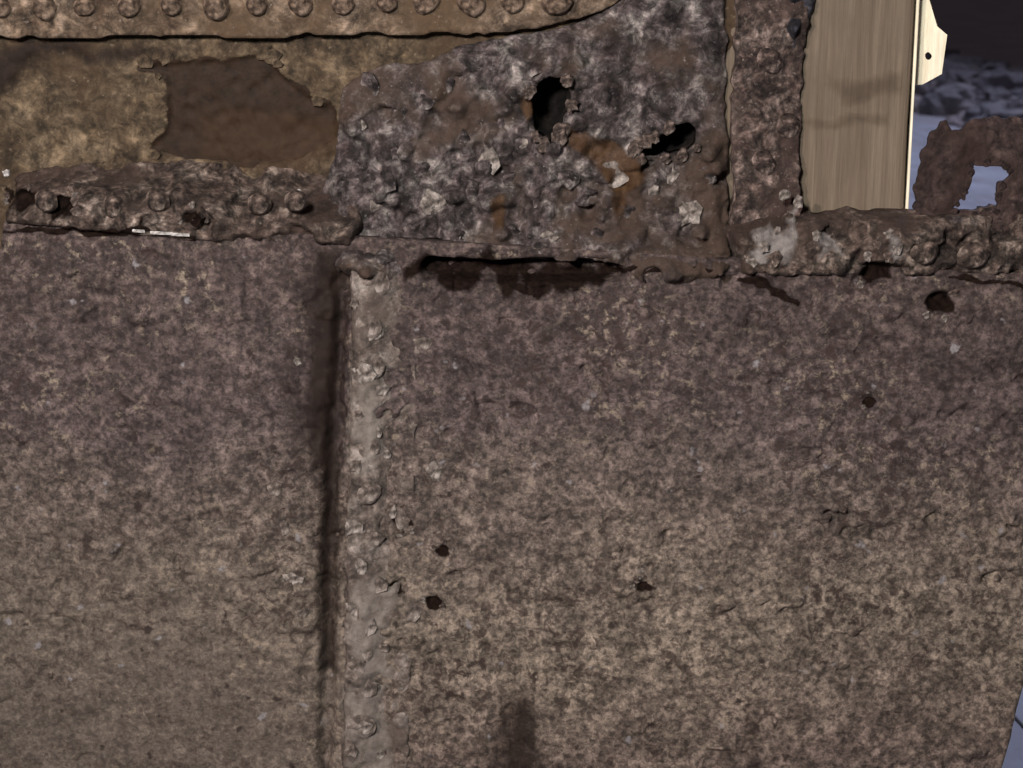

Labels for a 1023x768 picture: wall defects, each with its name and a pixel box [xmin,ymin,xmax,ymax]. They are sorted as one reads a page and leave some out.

spalling [132,0,803,284]
rust [523,99,531,120]
rust [568,130,644,214]
peeling [812,230,839,257]
water stain [503,699,534,768]